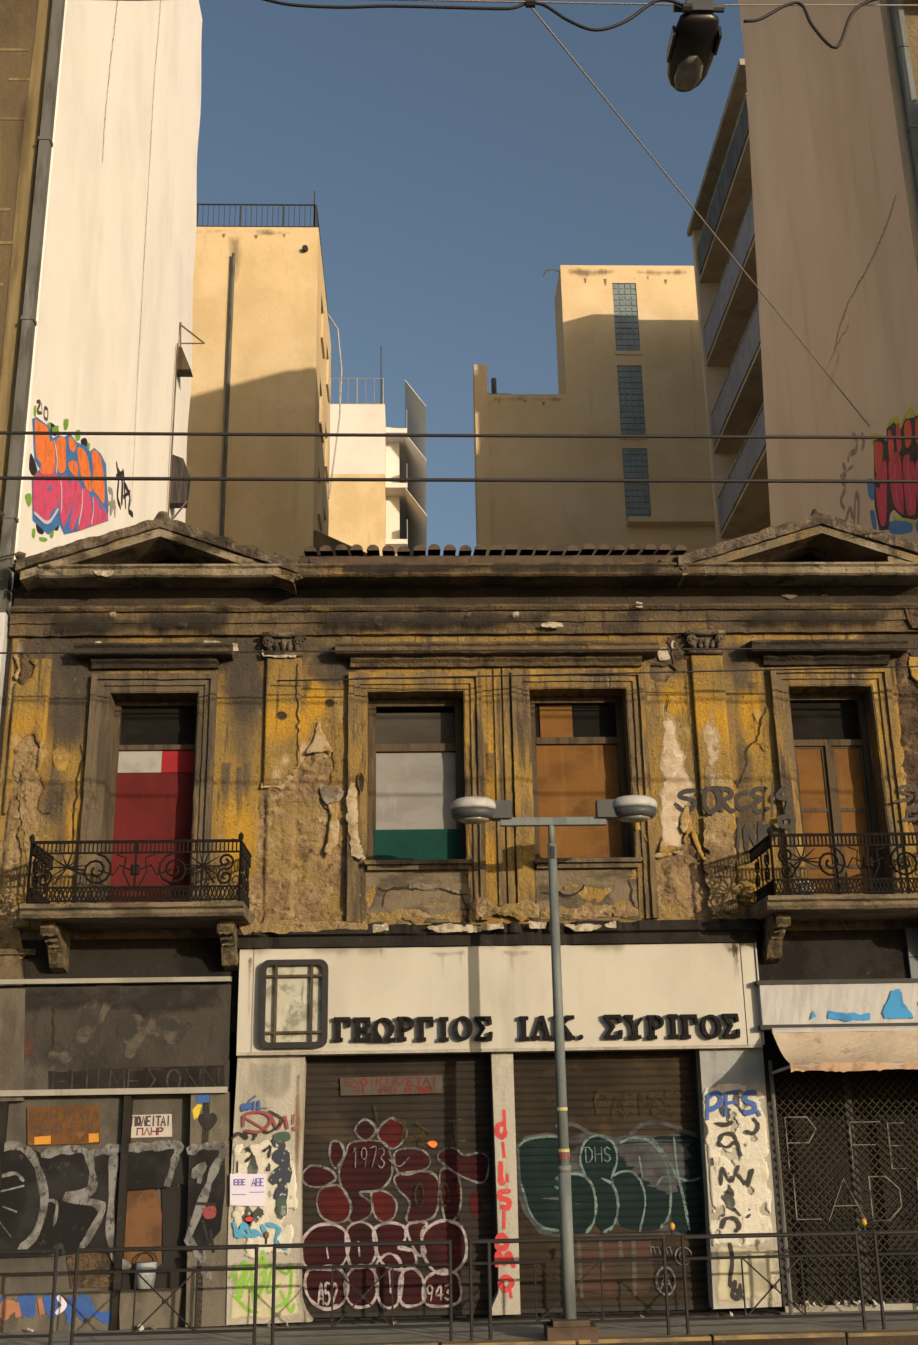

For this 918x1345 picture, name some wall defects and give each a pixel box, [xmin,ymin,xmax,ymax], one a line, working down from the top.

peeling [0,735,70,959]
peeling [229,721,639,935]
peeling [635,718,757,920]
crack [739,707,766,784]
peeling [894,653,918,854]
peeling [718,1245,775,1301]